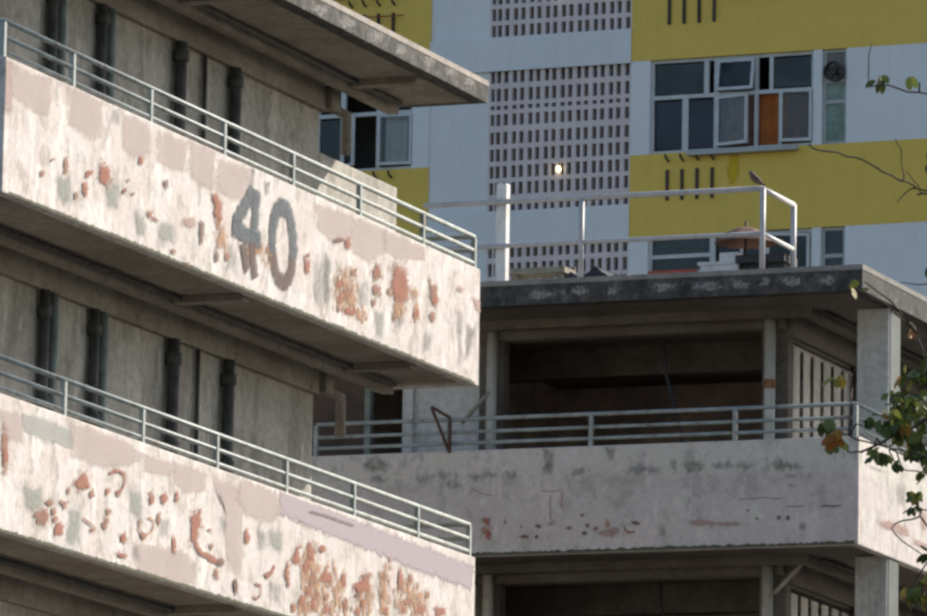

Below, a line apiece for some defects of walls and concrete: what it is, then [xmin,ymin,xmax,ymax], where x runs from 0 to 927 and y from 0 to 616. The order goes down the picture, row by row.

spalling [331,257,440,328]
spalling [33,469,126,537]
spalling [139,489,179,542]
spalling [189,505,225,580]
spalling [253,538,447,616]
spalling [580,514,640,536]